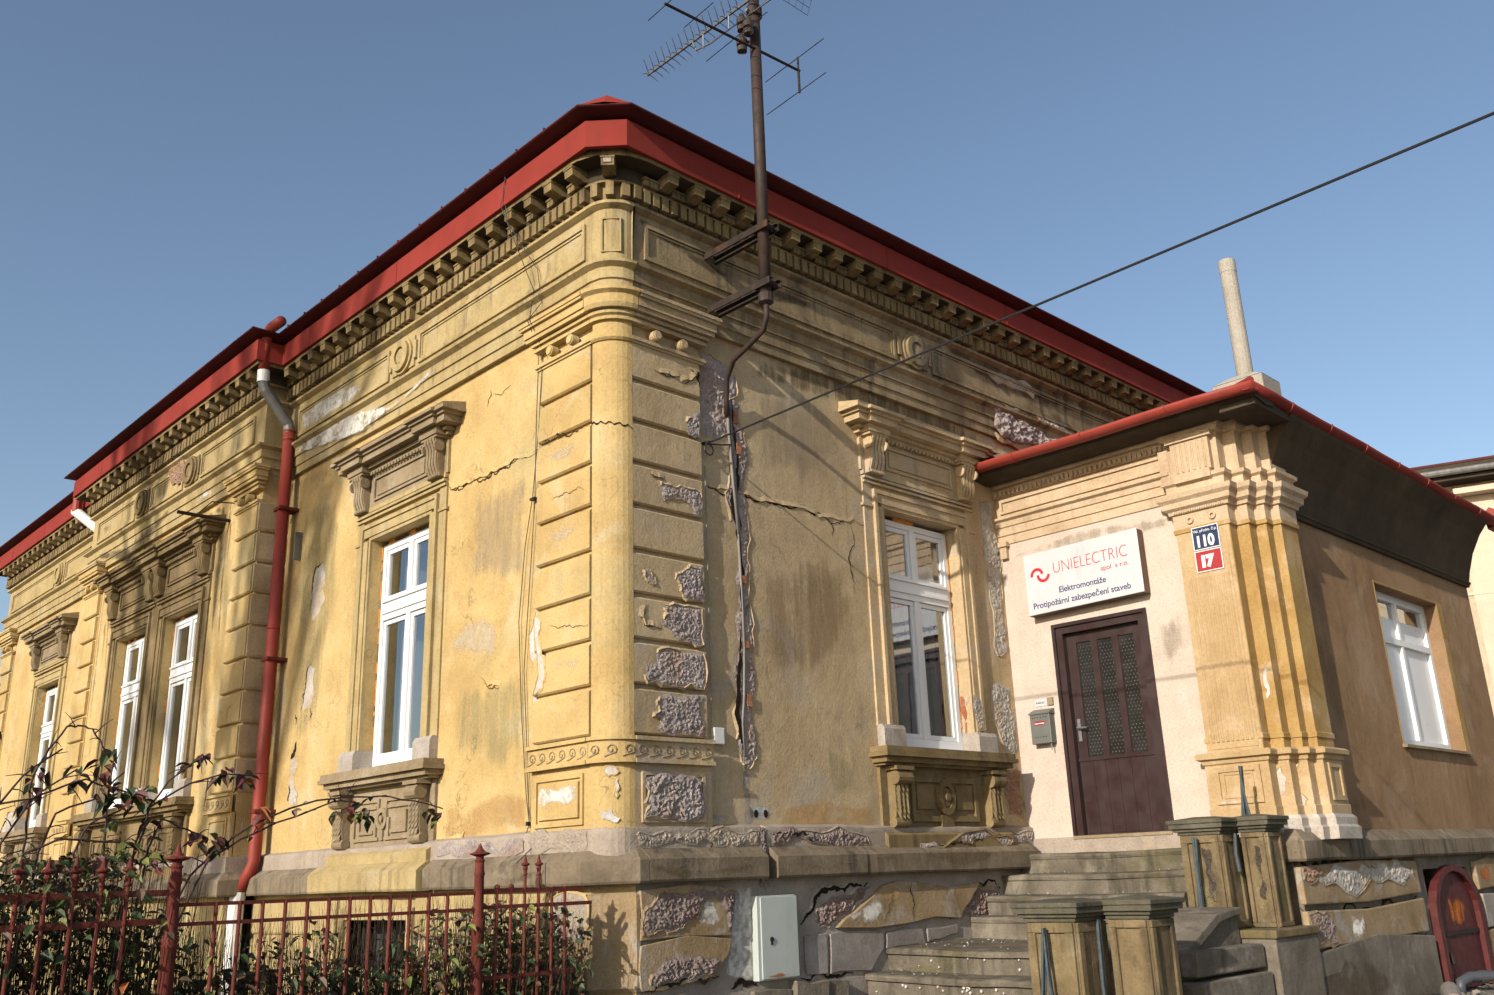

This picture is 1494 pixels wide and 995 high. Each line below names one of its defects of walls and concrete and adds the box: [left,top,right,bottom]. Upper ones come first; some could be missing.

flaking render [987,372,1069,450]
crack [449,420,633,491]
crack [651,469,664,479]
flaking render [310,563,325,620]
crack [655,366,863,772]
flaking render [301,665,315,712]
flaking render [529,601,547,706]
flaking render [642,563,709,737]
flaking render [635,773,870,855]
flaking render [640,886,736,937]
flaking render [1301,858,1414,899]
flaking render [648,956,720,988]